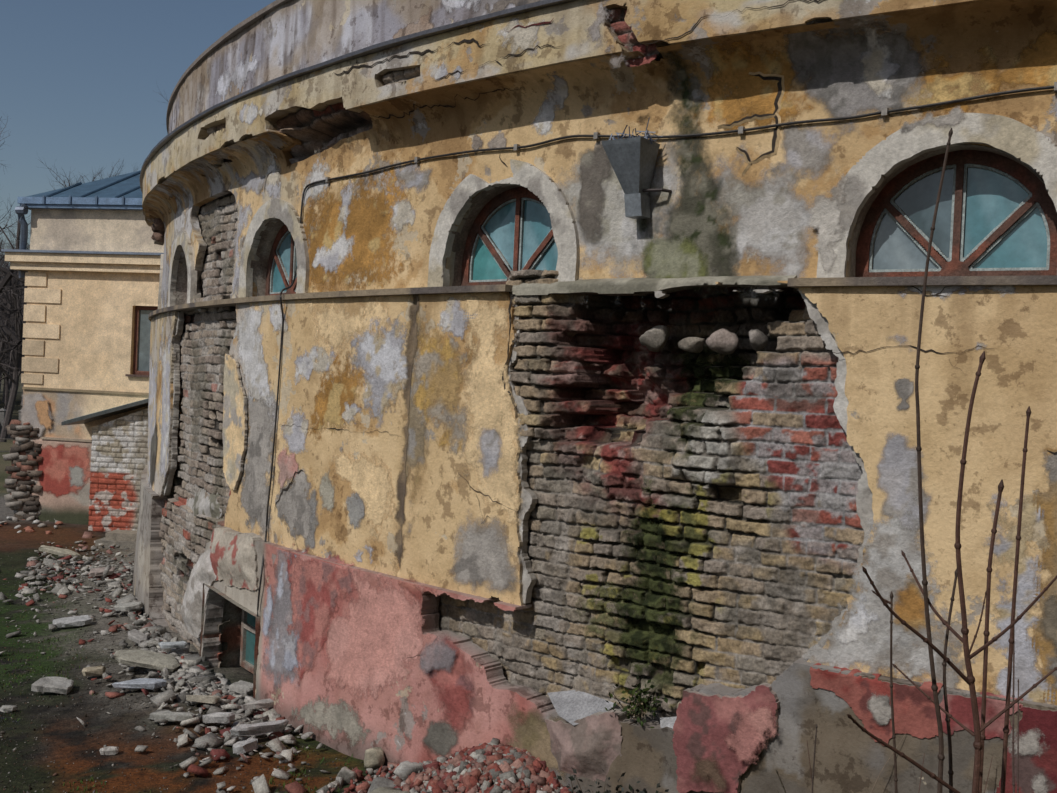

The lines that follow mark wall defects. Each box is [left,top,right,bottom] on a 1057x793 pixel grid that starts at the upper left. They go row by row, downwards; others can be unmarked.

peeling [215,55,263,124]
spalling [262,103,373,206]
crack [335,18,560,119]
spalling [588,0,659,68]
leakage [558,52,831,288]
crack [717,71,785,176]
peeling [312,181,358,273]
peeling [342,318,408,423]
crack [824,345,994,371]
spalling [0,400,91,534]
spalling [147,192,356,685]
spalling [438,270,1057,793]